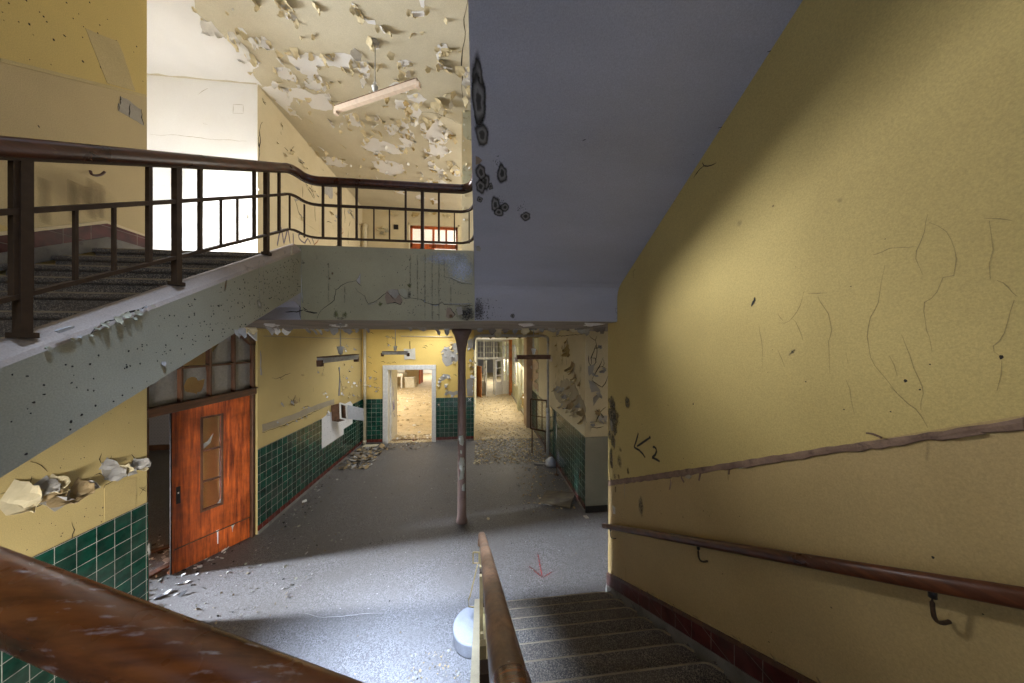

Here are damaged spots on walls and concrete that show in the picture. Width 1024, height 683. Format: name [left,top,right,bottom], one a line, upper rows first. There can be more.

peeling [147,0,482,236]
water stain [472,56,488,146]
water stain [475,155,530,221]
crack [288,260,471,318]
peeling [55,305,156,342]
peeling [408,307,608,461]
peeling [0,454,152,516]